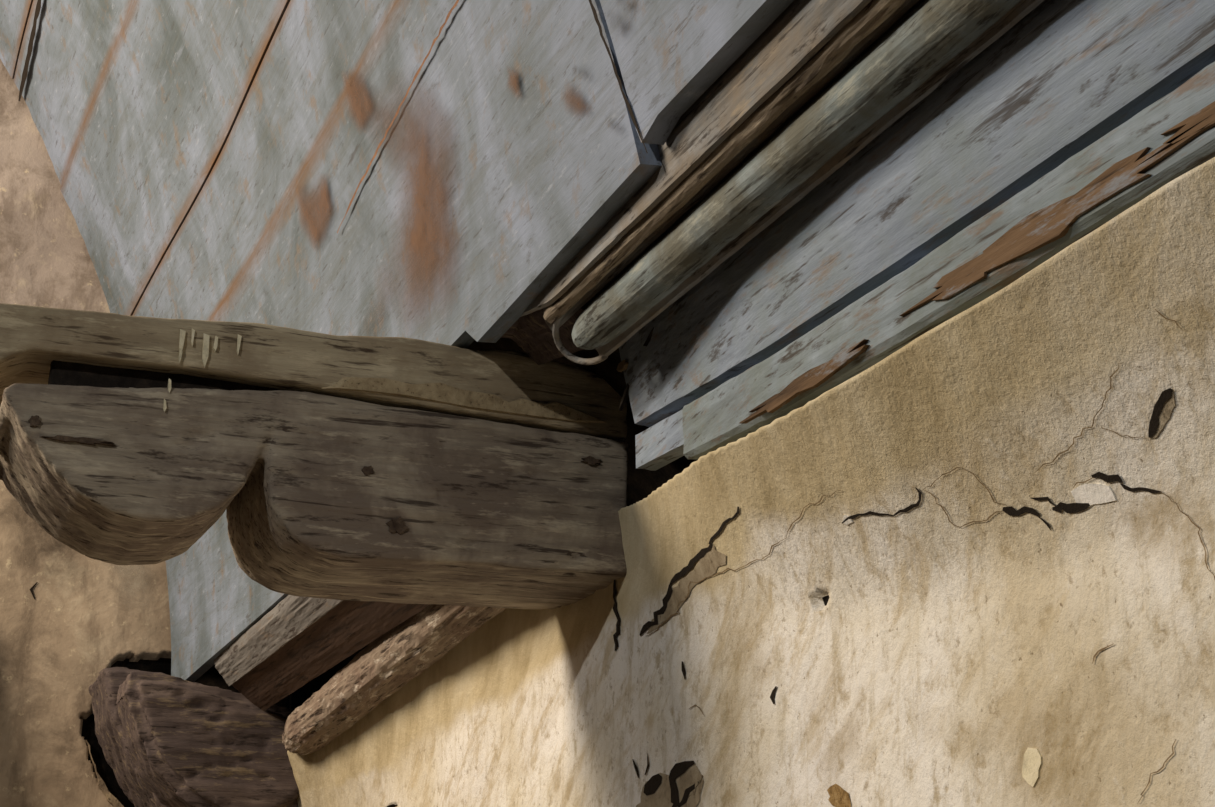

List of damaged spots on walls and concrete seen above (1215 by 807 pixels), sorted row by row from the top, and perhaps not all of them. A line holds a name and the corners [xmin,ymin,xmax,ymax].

peeling [900,101,1215,316]
peeling [740,339,870,424]
crack [612,361,1215,651]
crack [682,661,704,715]
crack [769,686,777,704]
flaking render [632,753,703,807]
crack [1137,739,1176,804]